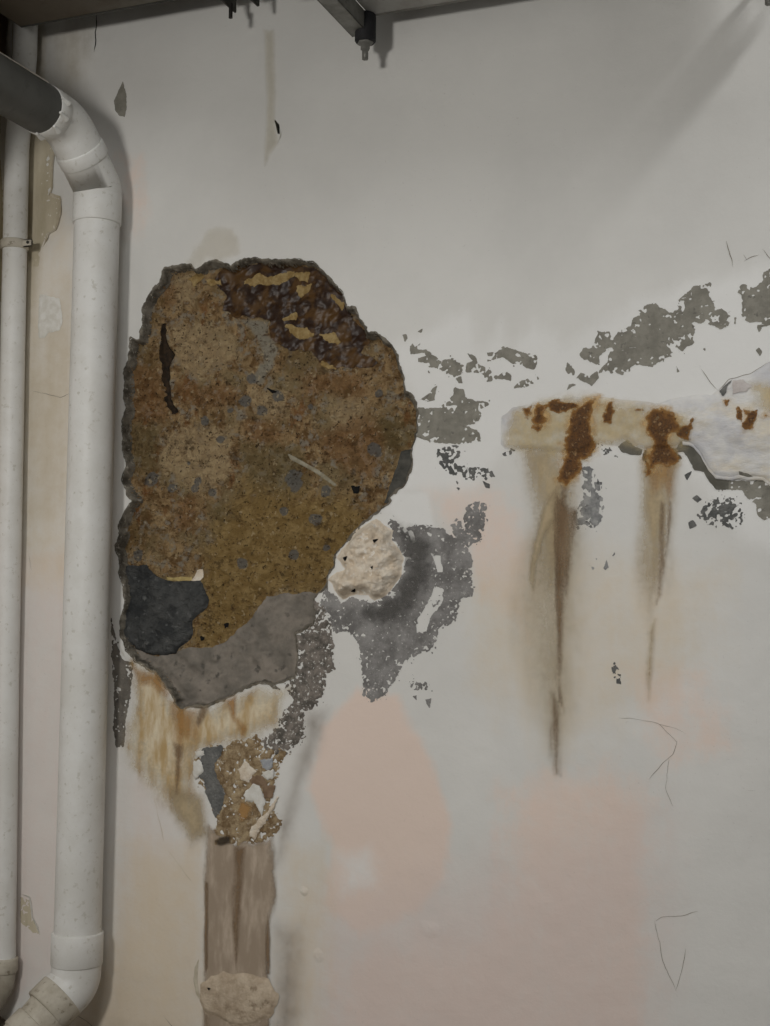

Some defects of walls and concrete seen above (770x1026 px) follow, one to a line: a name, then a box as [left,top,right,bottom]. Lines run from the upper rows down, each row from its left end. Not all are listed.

peeling [565,269,770,390]
spalling [111,257,539,748]
leakage [509,402,581,667]
corrosion [523,396,615,486]
leakage [590,405,654,445]
leakage [644,464,675,580]
corrosion [635,407,694,476]
peeling [674,442,770,529]
leakage [128,663,282,981]
peeling [193,734,291,846]
crack [632,718,684,806]
crack [655,911,697,989]